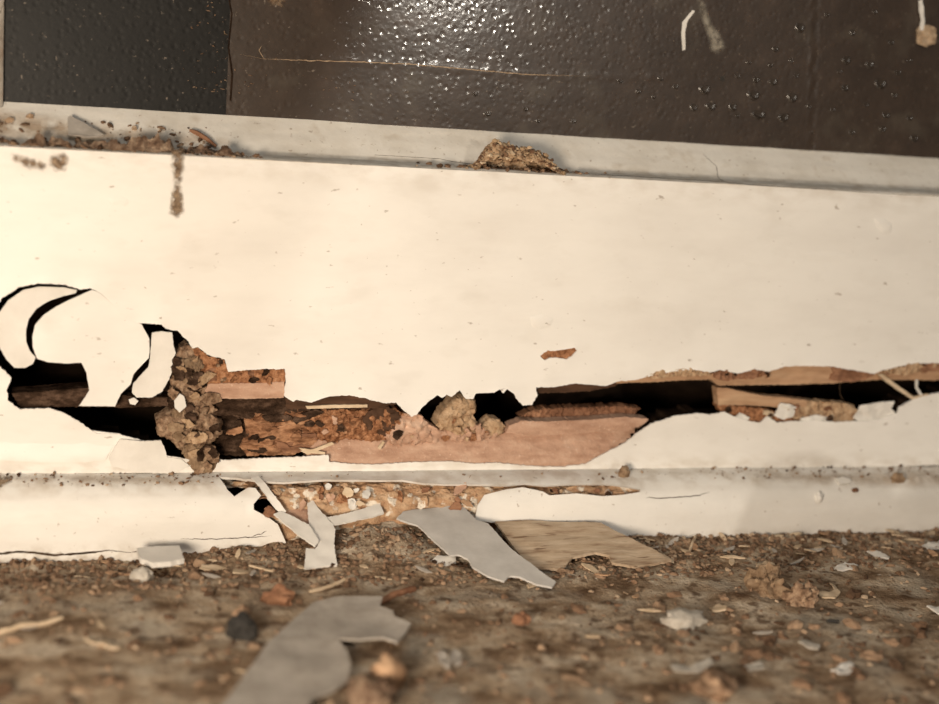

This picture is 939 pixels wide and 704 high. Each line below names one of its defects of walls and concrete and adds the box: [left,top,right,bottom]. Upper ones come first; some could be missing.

peeling [0,286,176,407]
spalling [541,348,576,360]
peeling [315,415,360,437]
peeling [452,418,490,441]
peeling [0,430,116,463]
peeling [251,476,286,513]
crack [183,531,266,540]
peeling [304,500,384,570]
crack [0,549,137,557]
peeling [137,545,184,568]